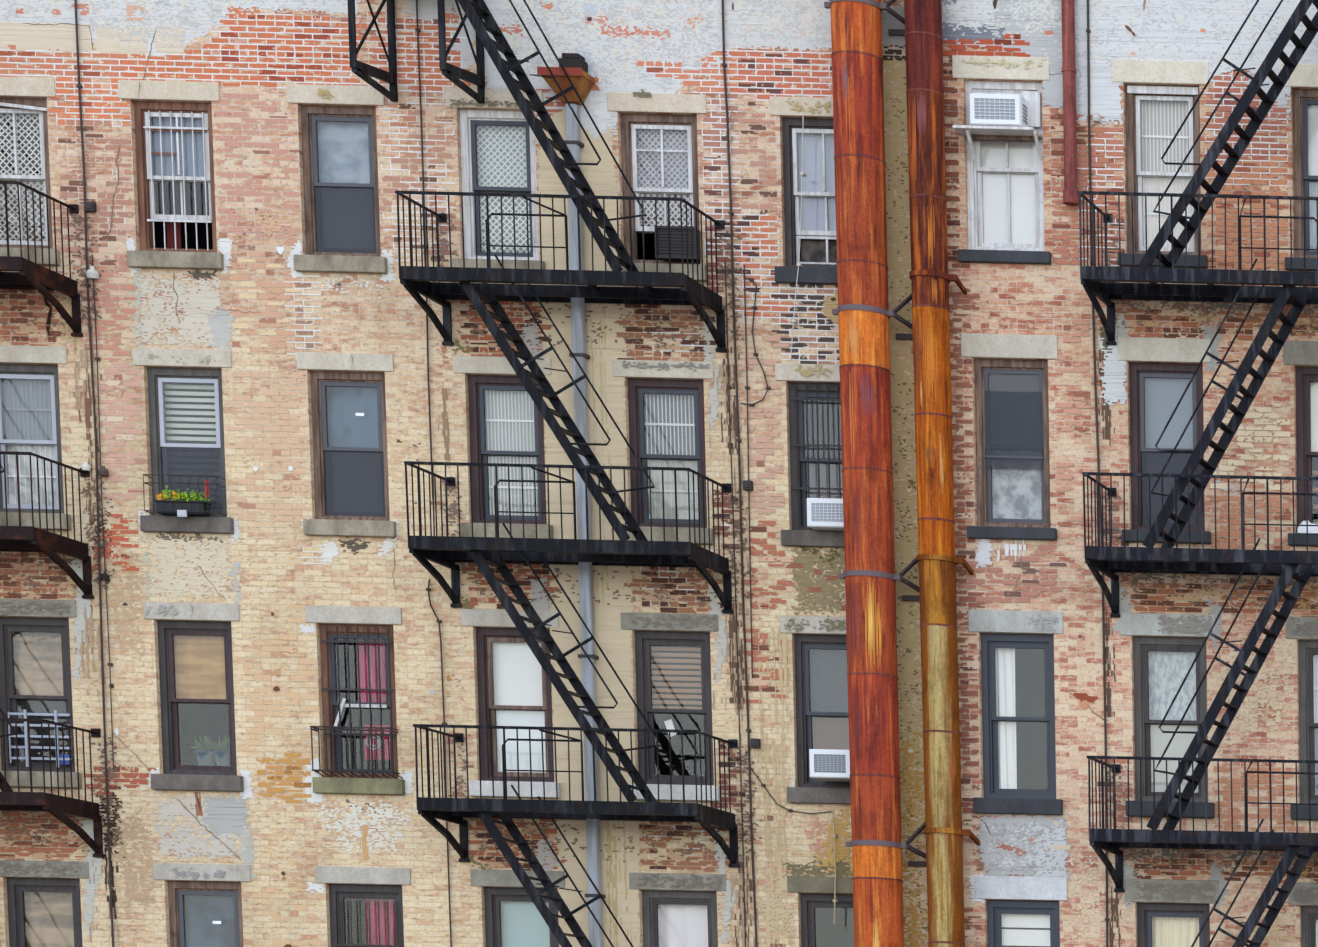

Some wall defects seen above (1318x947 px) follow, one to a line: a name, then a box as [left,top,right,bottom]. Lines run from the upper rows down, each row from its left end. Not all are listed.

spalling [499,4,539,58]
flaking render [529,79,565,132]
flaking render [943,31,1054,268]
flaking render [1050,108,1124,265]
flaking render [536,0,845,613]
flaking render [949,288,1129,872]
flaking render [742,629,789,703]